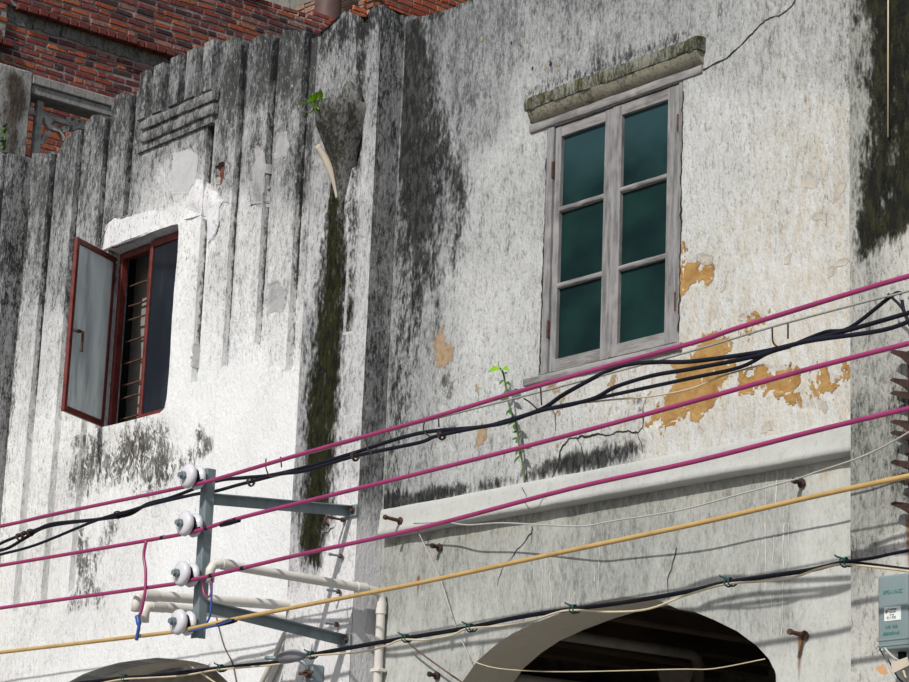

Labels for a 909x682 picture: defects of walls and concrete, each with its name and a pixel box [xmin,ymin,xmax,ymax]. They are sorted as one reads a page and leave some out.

crack [692,0,795,71]
water stain [0,72,26,154]
water stain [852,0,909,260]
water stain [395,16,471,354]
spalling [680,241,725,297]
water stain [300,183,354,504]
peeling [433,324,454,368]
spalling [645,308,850,437]
water stain [68,417,213,497]
water stain [383,440,641,509]
crack [497,395,648,585]
water stain [297,512,335,572]